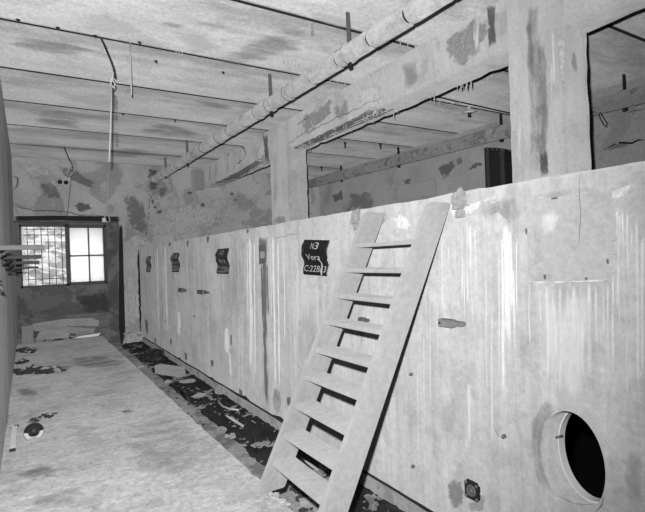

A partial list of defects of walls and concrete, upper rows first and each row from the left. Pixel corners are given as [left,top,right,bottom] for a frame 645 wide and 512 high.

spalling [295,79,406,151]
water stain [540,153,548,172]
crack [609,139,642,147]
water stain [441,222,477,314]
water stain [479,225,518,438]
water stain [539,211,644,387]